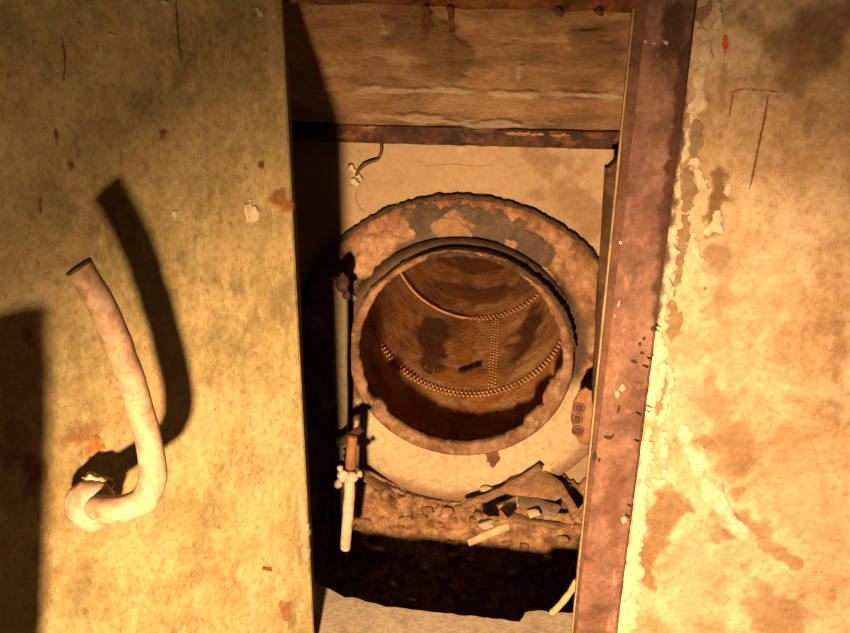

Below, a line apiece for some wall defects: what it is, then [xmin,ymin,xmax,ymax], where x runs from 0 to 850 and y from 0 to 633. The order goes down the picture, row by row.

peeling [244,200,260,222]
corrosion [653,4,692,327]
peeling [631,1,724,364]
corrosion [437,256,504,275]
corrosion [434,282,510,305]
corrosion [348,393,360,431]
corrosion [485,451,500,468]
peeling [640,364,716,486]
leakage [677,425,750,541]
peeling [621,495,647,601]
leakage [639,488,693,589]